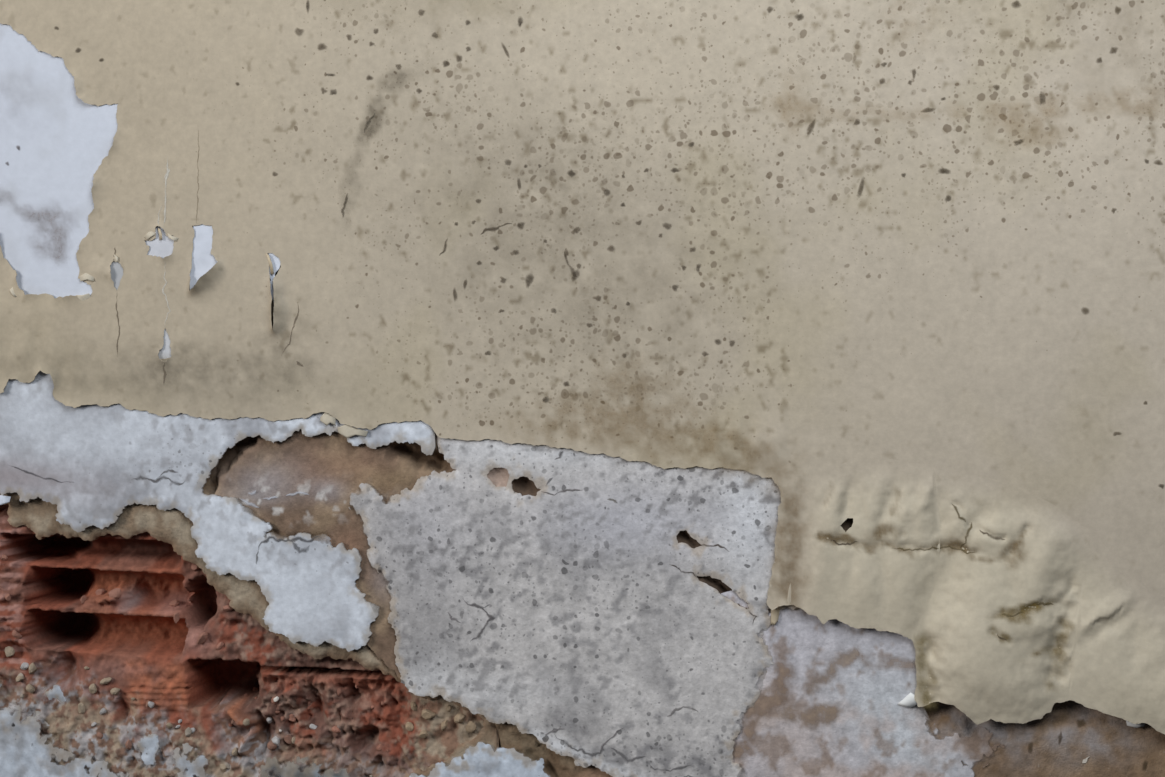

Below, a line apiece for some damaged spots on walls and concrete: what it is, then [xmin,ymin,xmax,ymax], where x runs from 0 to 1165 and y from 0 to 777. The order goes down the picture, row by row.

peeling [0,23,118,301]
peeling [110,255,124,290]
peeling [144,226,178,258]
peeling [190,224,217,289]
peeling [266,253,281,301]
peeling [158,329,172,361]
flaking render [0,371,1165,777]